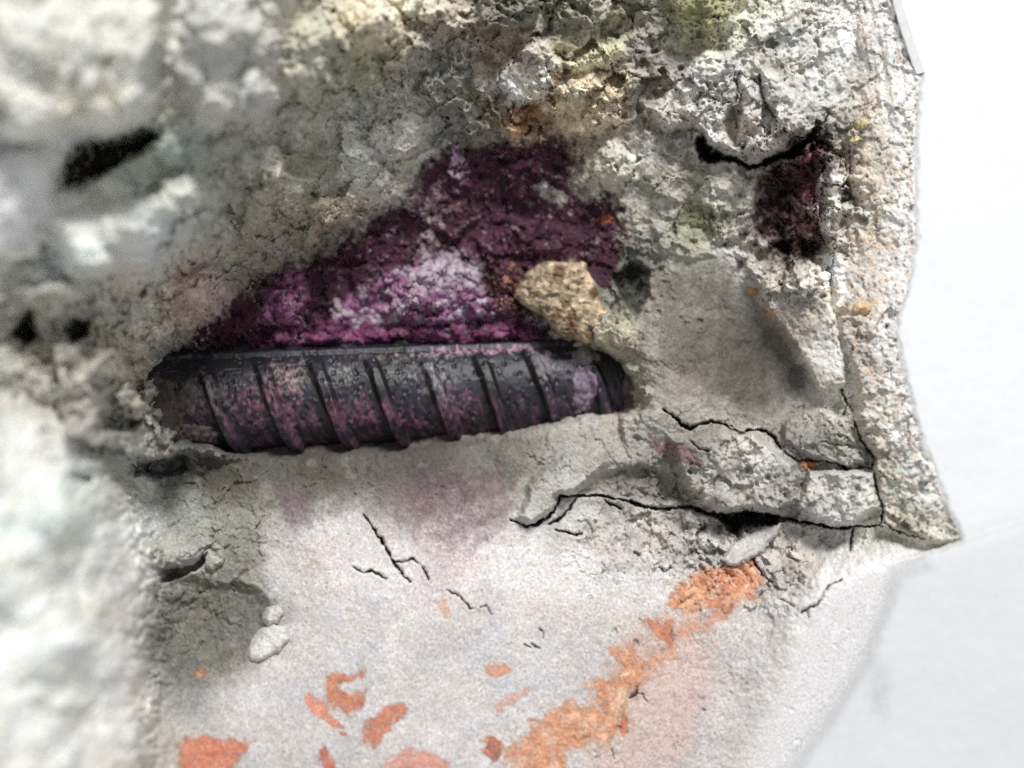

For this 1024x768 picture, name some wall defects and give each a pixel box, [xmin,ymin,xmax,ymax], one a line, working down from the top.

spalling [513,257,607,344]
spalling [615,268,648,314]
spalling [608,323,630,351]
crack [673,416,781,448]
crack [525,494,901,550]